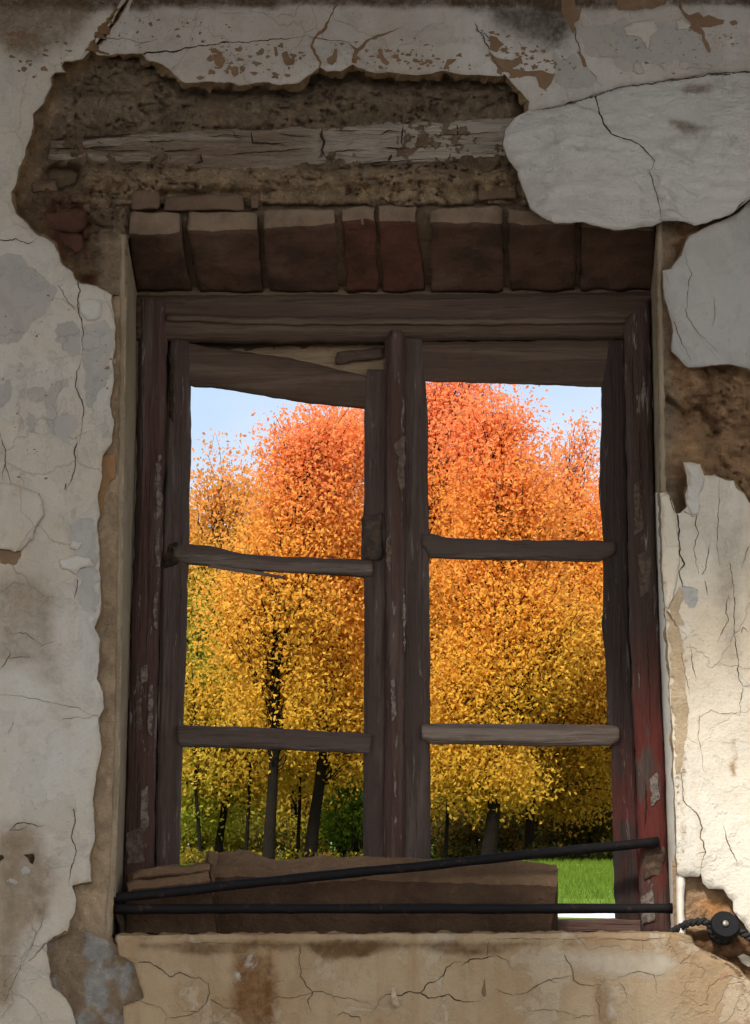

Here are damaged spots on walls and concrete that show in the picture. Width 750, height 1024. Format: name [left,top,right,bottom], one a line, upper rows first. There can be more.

crack [86,4,399,67]
peeling [610,0,739,74]
crack [537,28,750,218]
crack [58,282,84,489]
spalling [0,18,587,1024]
spalling [656,204,750,976]
crack [663,479,750,872]
crack [69,809,77,879]
damp [234,942,294,980]
damp [311,942,398,957]
crack [125,937,750,1024]